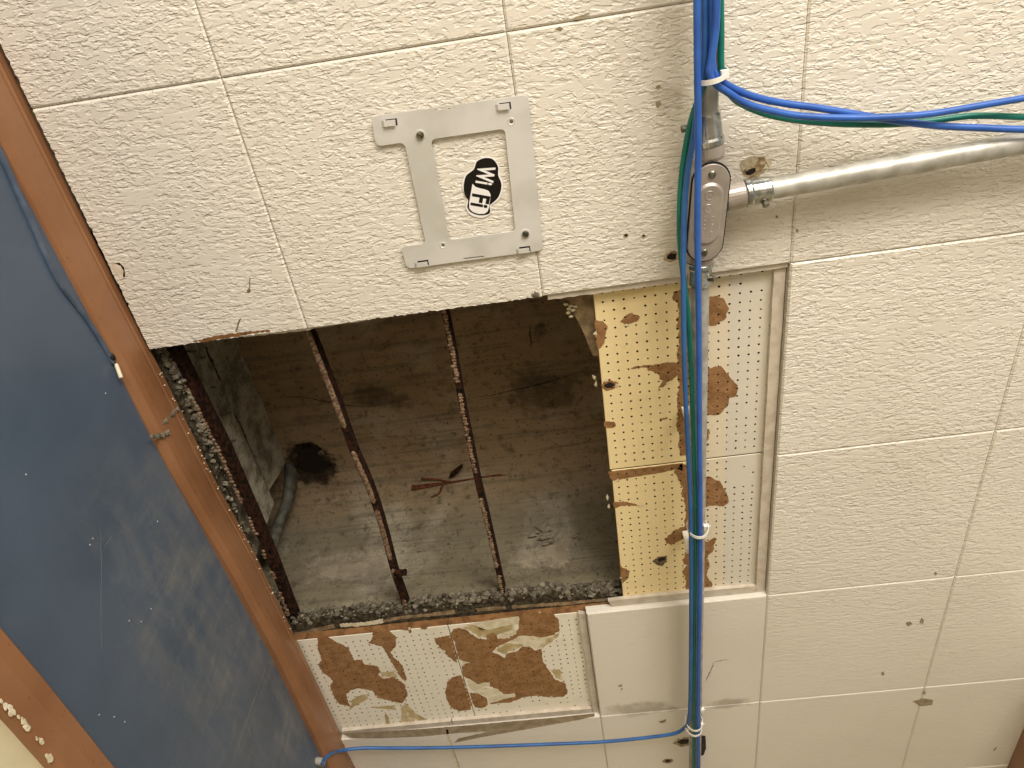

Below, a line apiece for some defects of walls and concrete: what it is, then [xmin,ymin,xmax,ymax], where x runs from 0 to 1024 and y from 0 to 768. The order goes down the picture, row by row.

spalling [194,318,270,342]
damp [289,448,336,485]